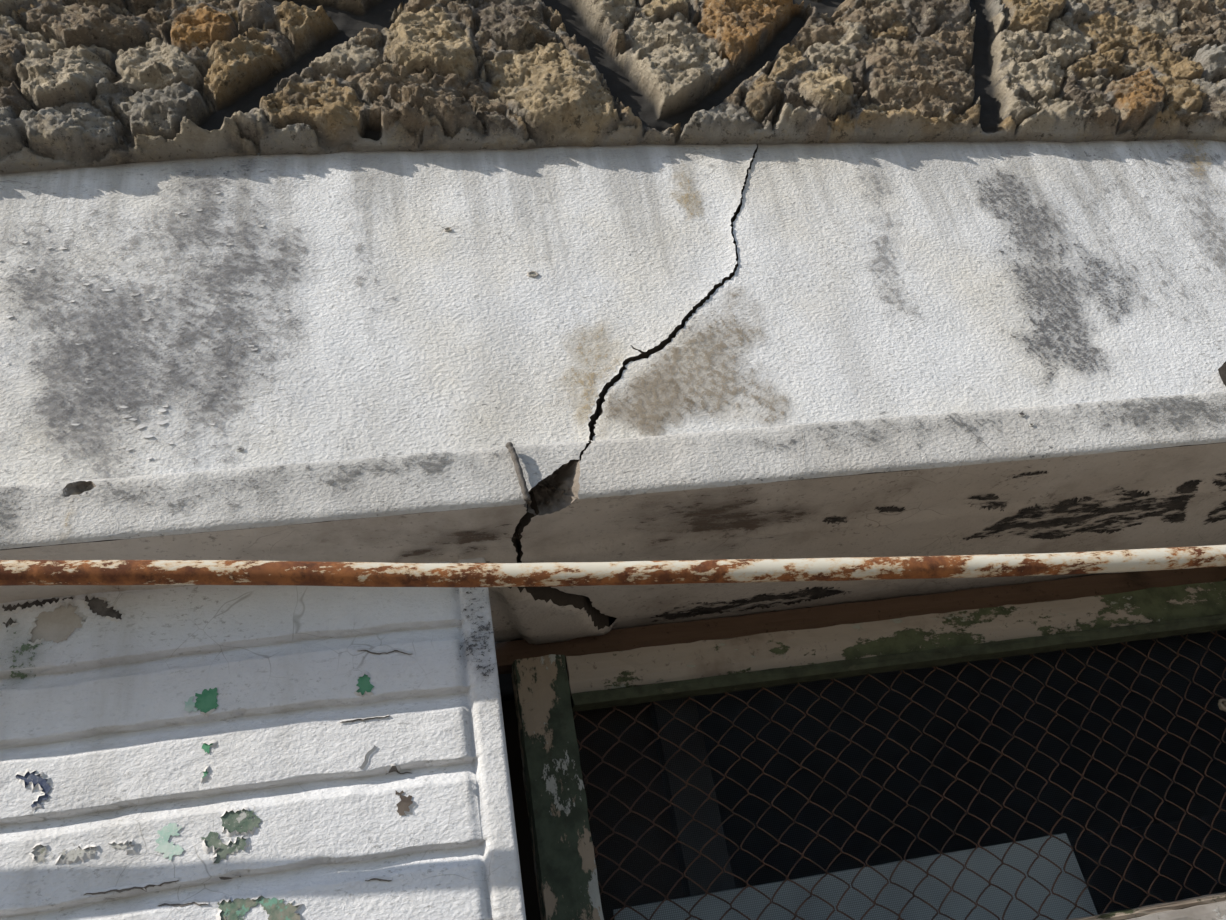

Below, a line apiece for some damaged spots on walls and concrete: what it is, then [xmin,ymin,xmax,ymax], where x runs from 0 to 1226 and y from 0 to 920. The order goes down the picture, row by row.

water stain [966,139,1226,387]
crack [577,146,811,462]
water stain [0,157,316,545]
water stain [563,288,789,435]
water stain [737,391,1226,460]
water stain [305,450,501,499]
spalling [522,459,580,516]
peeling [963,473,1226,541]
crack [508,489,609,630]
peeling [15,768,51,811]
peeling [201,807,261,863]
peeling [395,791,416,816]